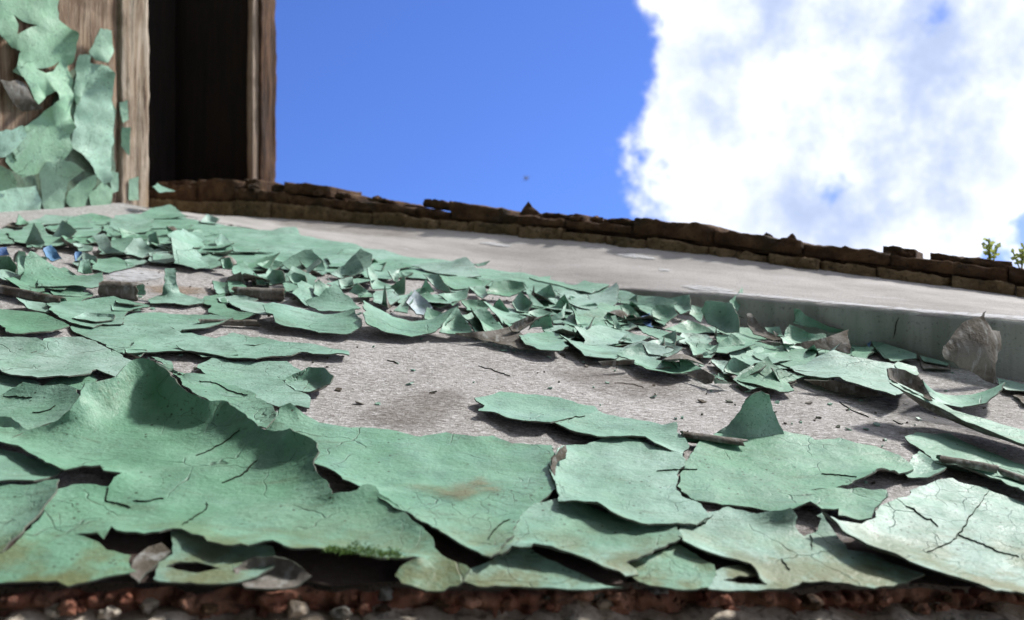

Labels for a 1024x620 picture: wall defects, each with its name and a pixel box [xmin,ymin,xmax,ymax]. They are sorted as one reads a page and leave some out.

peeling [0,0,119,212]
peeling [119,100,131,156]
peeling [128,176,139,200]
crack [199,380,248,395]
crack [3,395,56,413]
peeling [0,205,1024,620]
crack [196,430,239,456]
crack [222,460,257,483]
crack [106,489,164,508]
crack [906,491,1019,557]